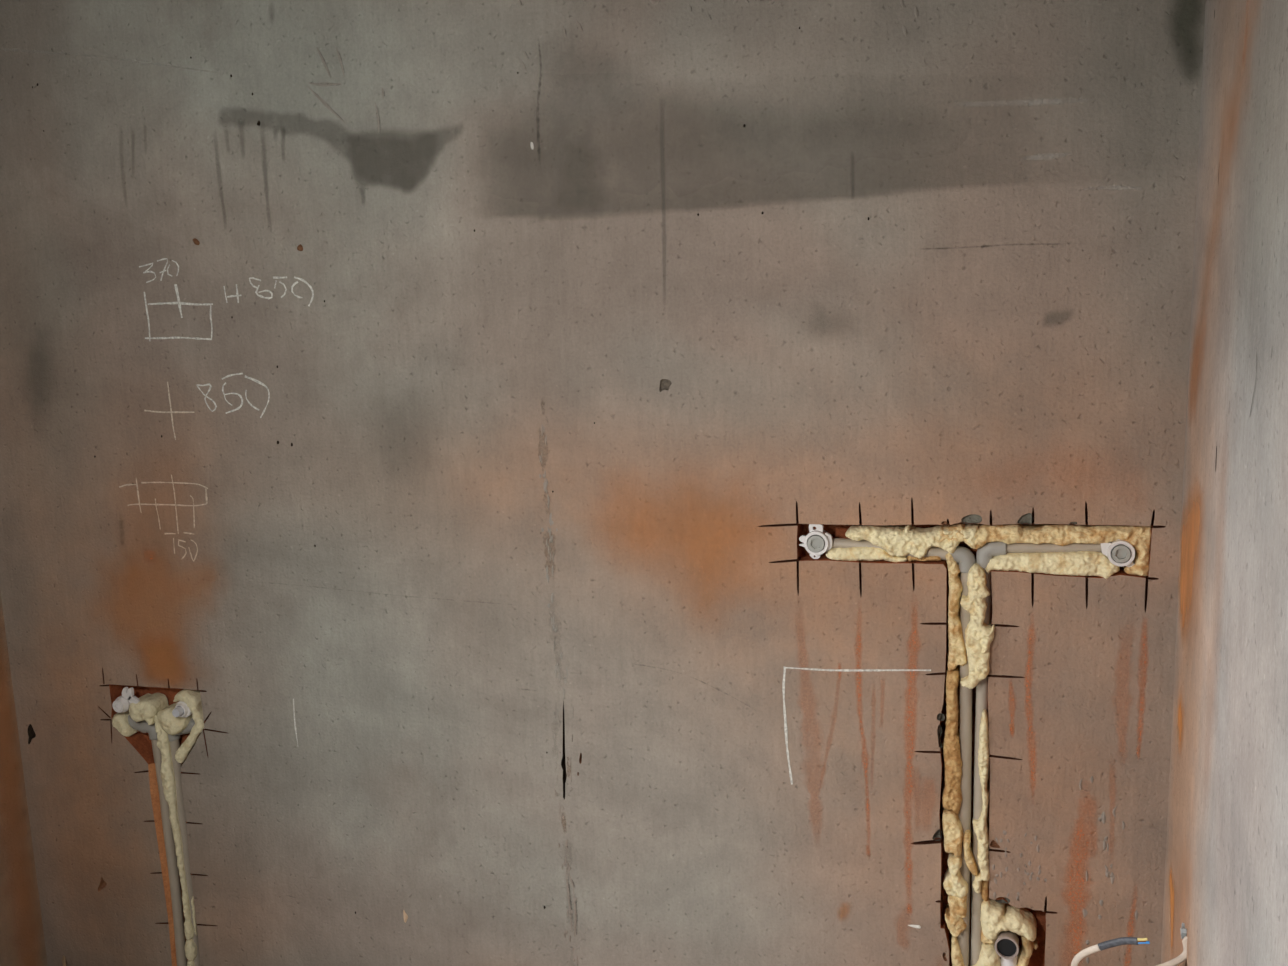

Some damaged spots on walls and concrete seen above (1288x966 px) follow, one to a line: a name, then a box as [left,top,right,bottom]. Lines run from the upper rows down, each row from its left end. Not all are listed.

crack [539,424,574,876]